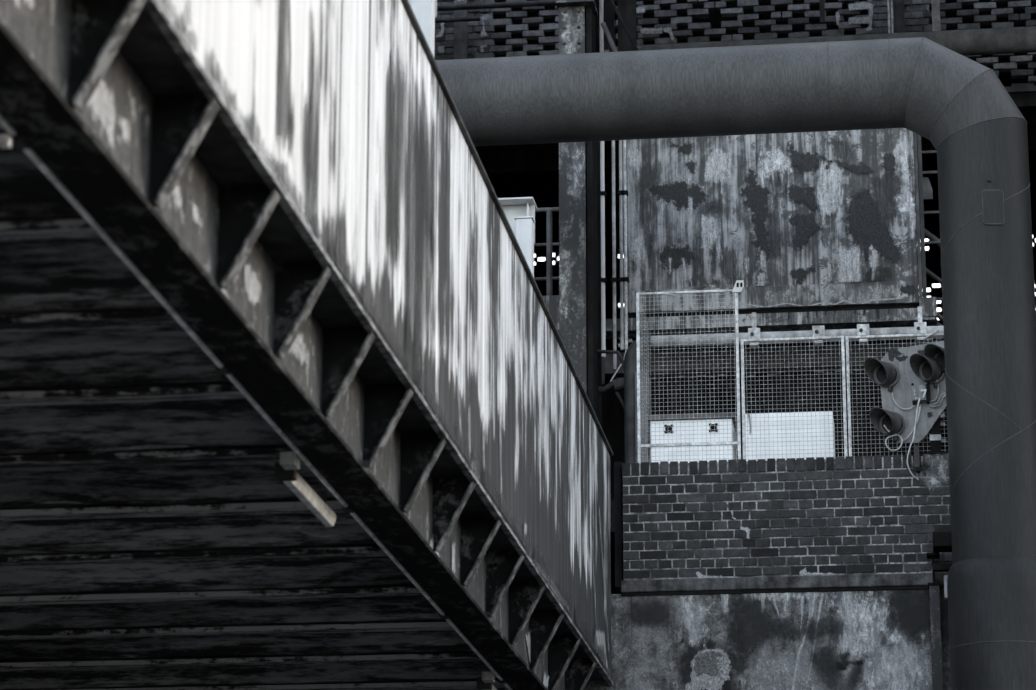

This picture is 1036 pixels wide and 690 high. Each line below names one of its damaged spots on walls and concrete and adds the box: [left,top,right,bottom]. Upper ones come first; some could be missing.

water stain [275,0,319,230]
peeling [646,142,722,224]
peeling [659,244,727,288]
rust [689,233,737,285]
peeling [739,166,772,286]
rust [831,137,848,161]
peeling [784,140,916,296]
spalling [685,647,732,690]
water stain [629,590,933,690]